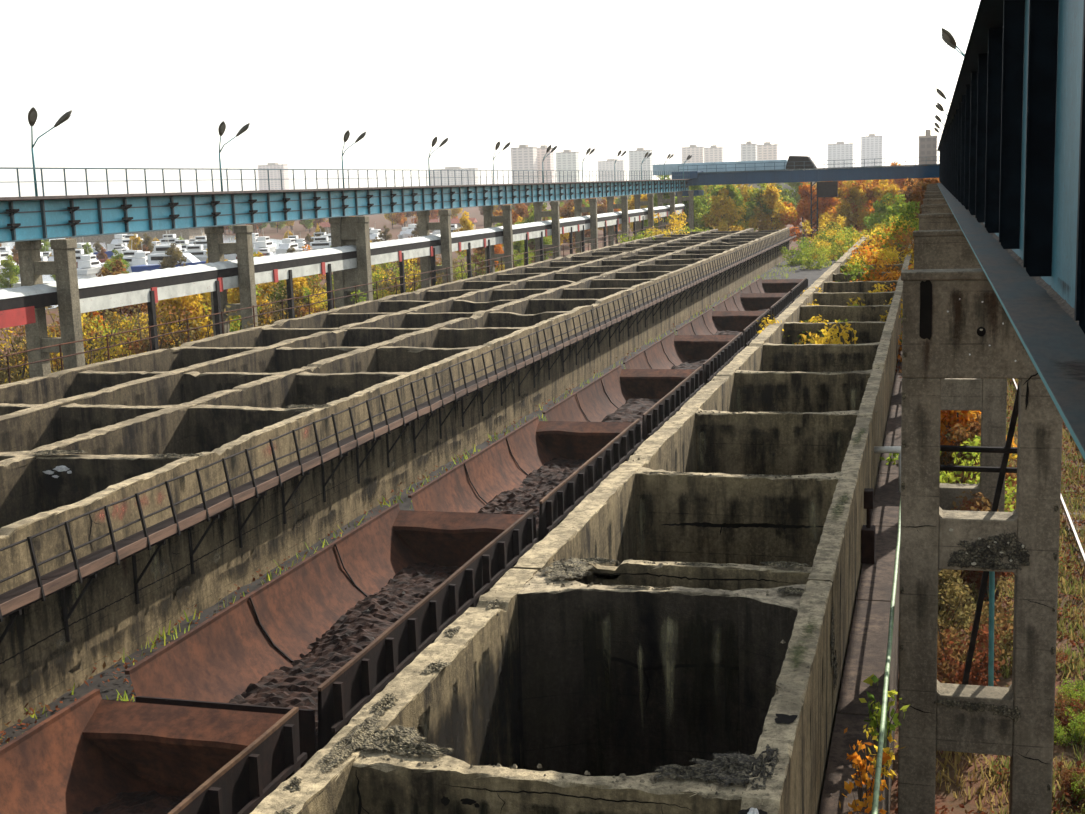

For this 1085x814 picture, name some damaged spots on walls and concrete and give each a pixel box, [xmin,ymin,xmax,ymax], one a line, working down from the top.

crack [661,522,824,534]
water stain [151,573,195,617]
water stain [220,534,284,578]
spalling [538,556,743,593]
spalling [948,531,1030,571]
water stain [5,606,72,701]
water stain [91,624,134,656]
water stain [665,618,740,753]
spalling [311,693,518,779]
spalling [640,744,779,795]
peeling [274,776,303,814]